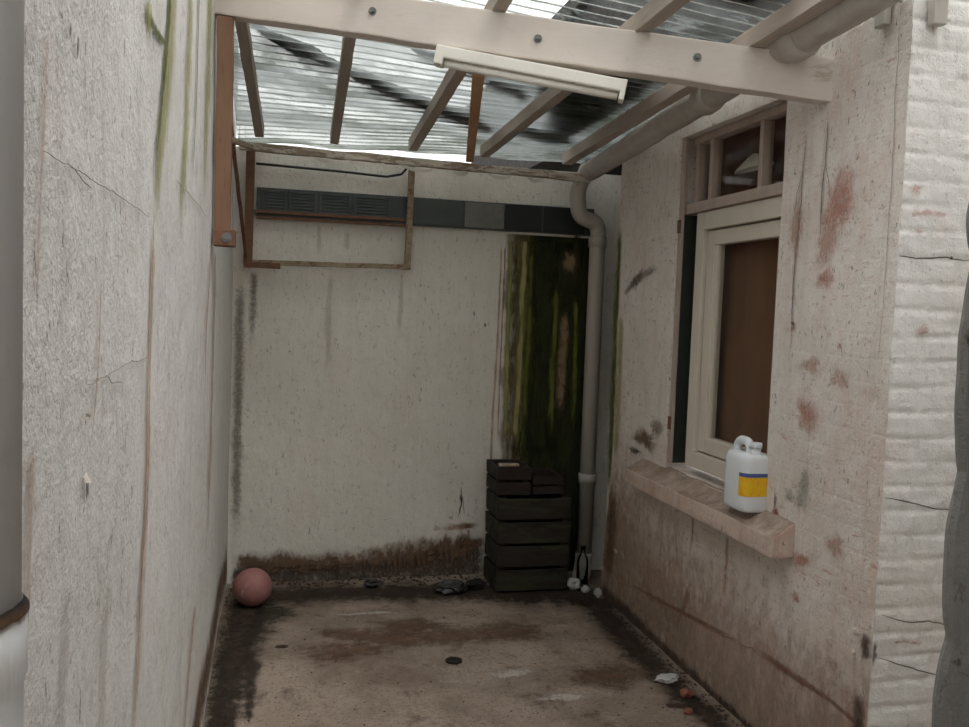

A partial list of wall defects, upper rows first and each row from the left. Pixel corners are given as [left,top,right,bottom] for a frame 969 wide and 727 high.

crack [44,151,145,215]
crack [87,357,149,385]
damp [233,275,256,513]
damp [630,421,661,453]
crack [888,498,949,510]
damp [185,485,866,727]
crack [882,615,944,625]
crack [880,658,936,675]